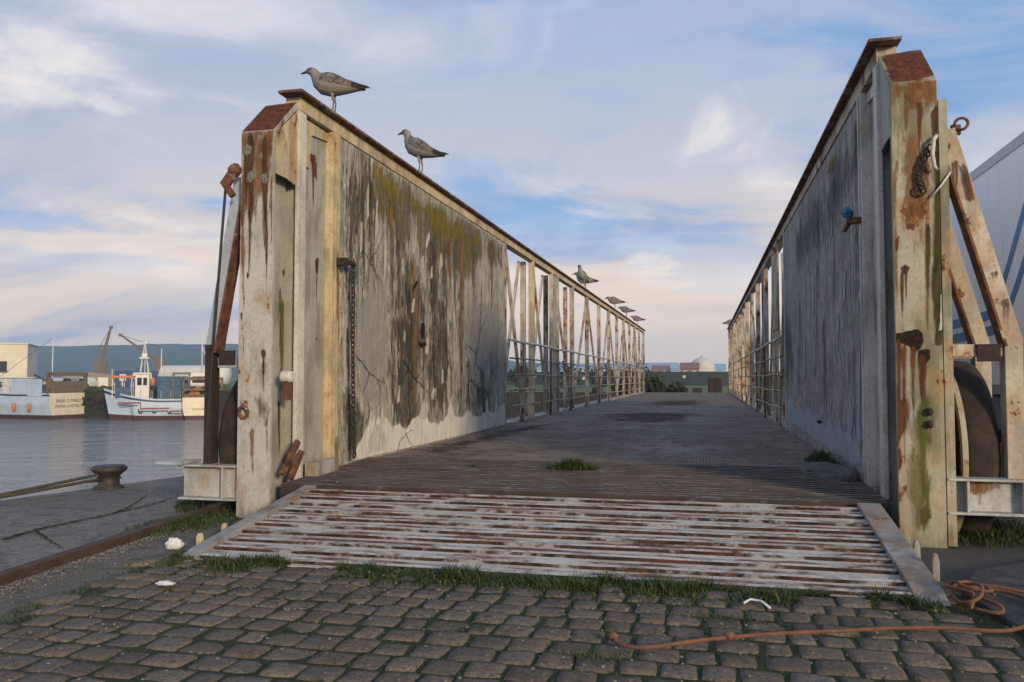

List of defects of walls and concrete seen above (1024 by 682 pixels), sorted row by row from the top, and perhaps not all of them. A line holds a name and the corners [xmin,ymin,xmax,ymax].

corrosion [241,102,296,289]
damp [796,116,858,303]
corrosion [882,50,938,317]
crack [2,495,170,548]
crack [357,356,430,396]
damp [340,151,502,462]
corrosion [896,340,927,470]
damp [919,399,929,523]